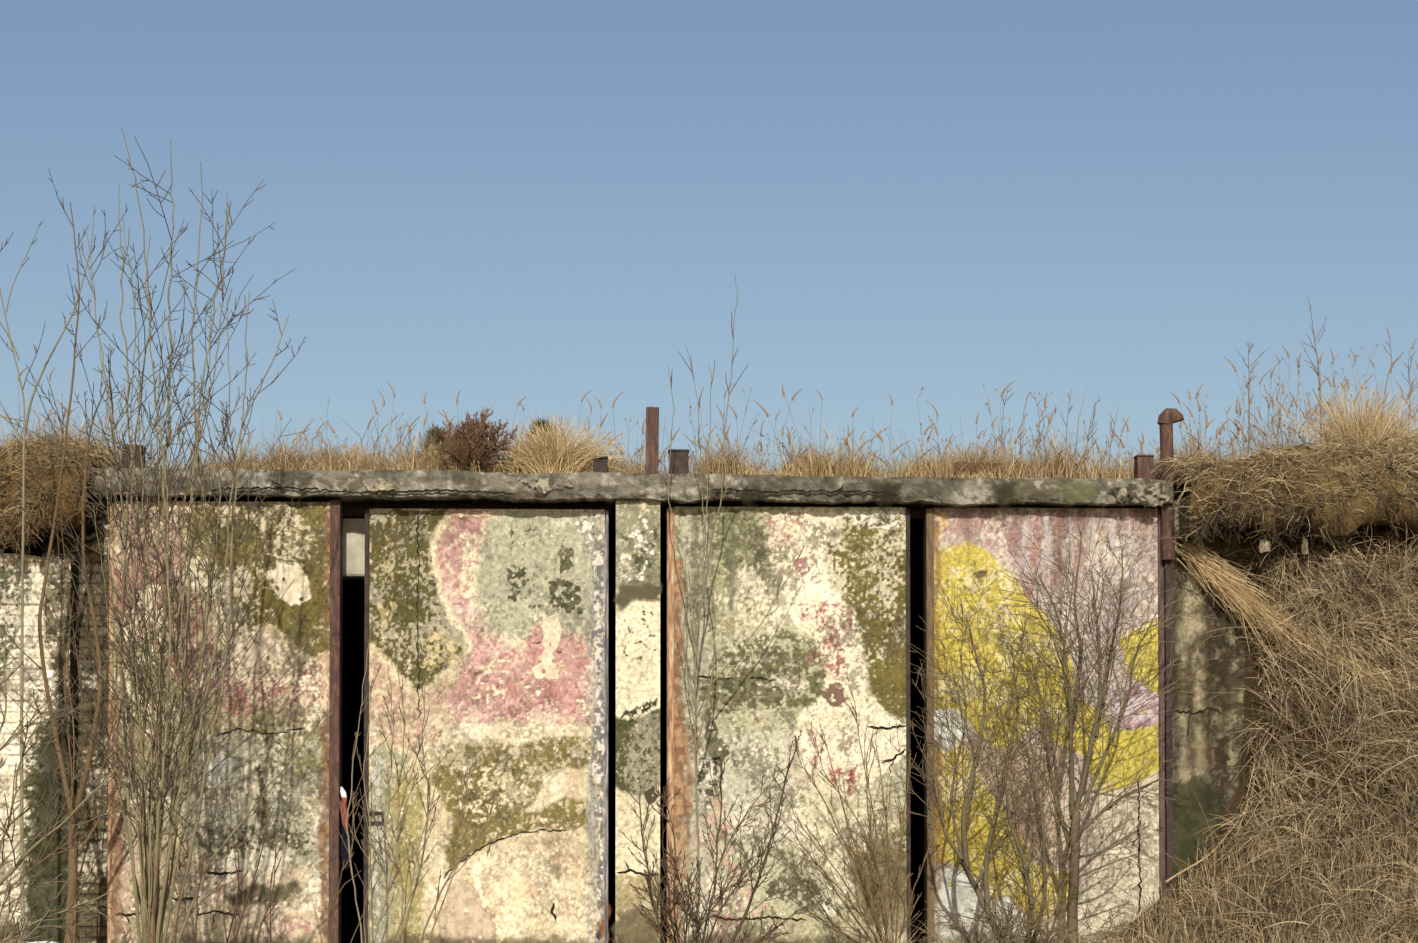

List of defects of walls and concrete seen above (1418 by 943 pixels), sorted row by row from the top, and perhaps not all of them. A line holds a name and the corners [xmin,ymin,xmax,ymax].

peeling [258,507,313,606]
peeling [842,508,905,530]
water stain [0,700,72,943]
crack [217,728,302,747]
peeling [457,767,520,824]
peeling [471,509,659,943]
corrosion [674,560,693,943]
peeling [697,675,784,802]
peeling [821,682,849,707]
water stain [1172,553,1228,811]
peeling [438,880,496,943]
peeling [766,877,838,918]